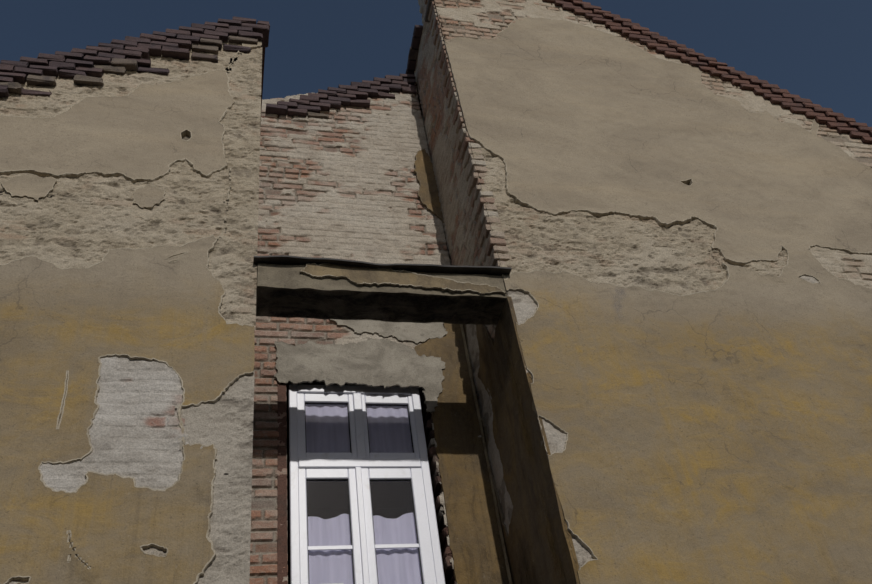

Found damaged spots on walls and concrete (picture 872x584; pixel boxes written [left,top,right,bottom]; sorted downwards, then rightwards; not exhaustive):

spalling [0,35,262,330]
spalling [300,135,789,325]
spalling [434,0,691,66]
spalling [700,72,872,169]
spalling [807,244,872,289]
spalling [36,354,255,584]
spalling [274,319,448,413]
flaking render [465,324,513,536]